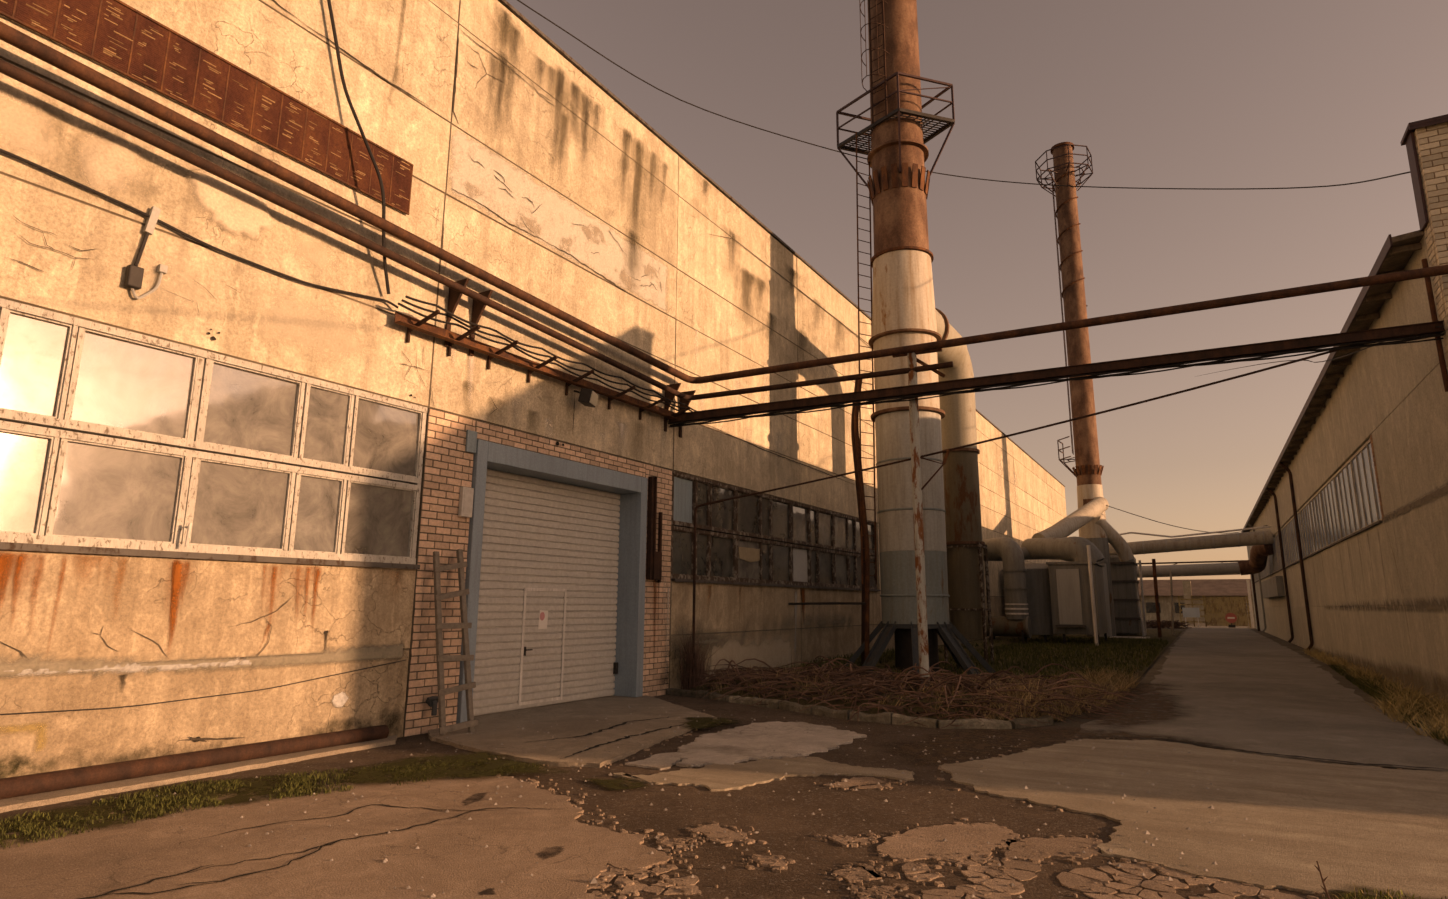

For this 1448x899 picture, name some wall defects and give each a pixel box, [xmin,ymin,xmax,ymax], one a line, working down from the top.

water stain [557,72,598,132]
water stain [624,132,641,177]
peeling [450,131,667,310]
rust [0,554,42,589]
rust [171,561,189,637]
rust [306,569,320,614]
crack [78,804,543,899]